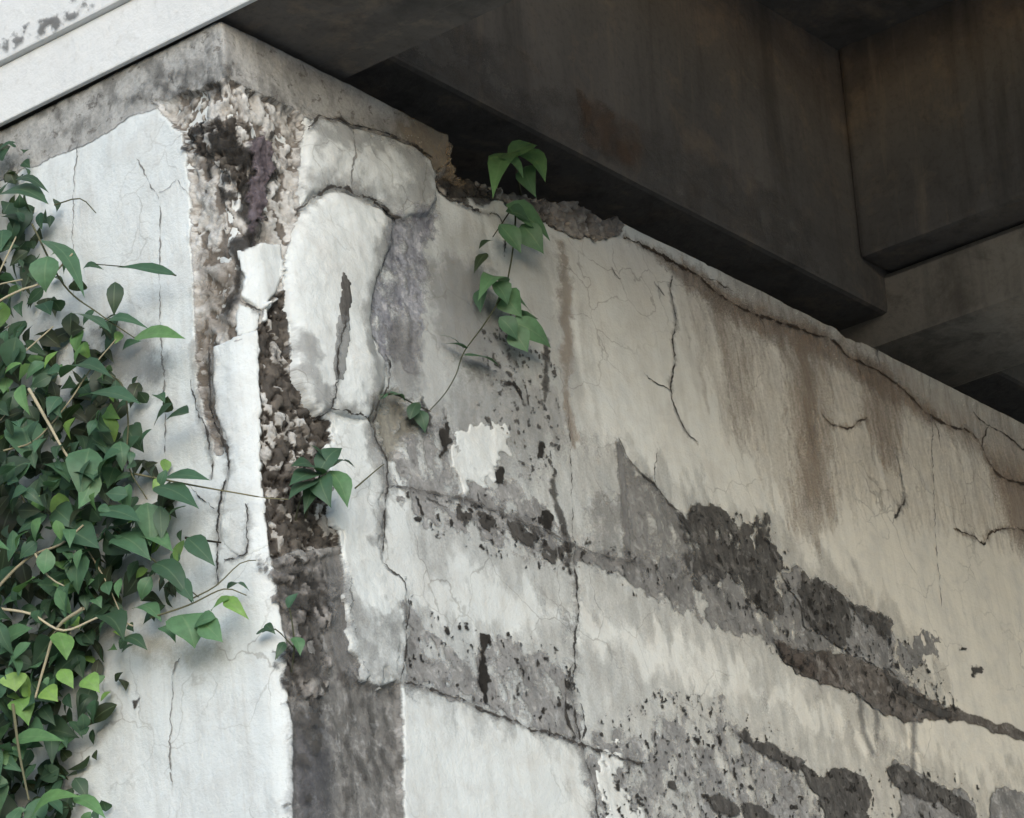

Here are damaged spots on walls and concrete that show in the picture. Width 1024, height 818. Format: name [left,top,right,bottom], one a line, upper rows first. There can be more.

crack [71,123,83,248]
crack [137,159,187,452]
crack [188,346,271,584]
crack [314,321,645,818]
spalling [151,77,872,818]
leakage [401,328,958,818]
peeling [389,396,1024,741]
crack [619,237,1024,606]
spalling [887,759,977,818]
spalling [990,786,1024,818]